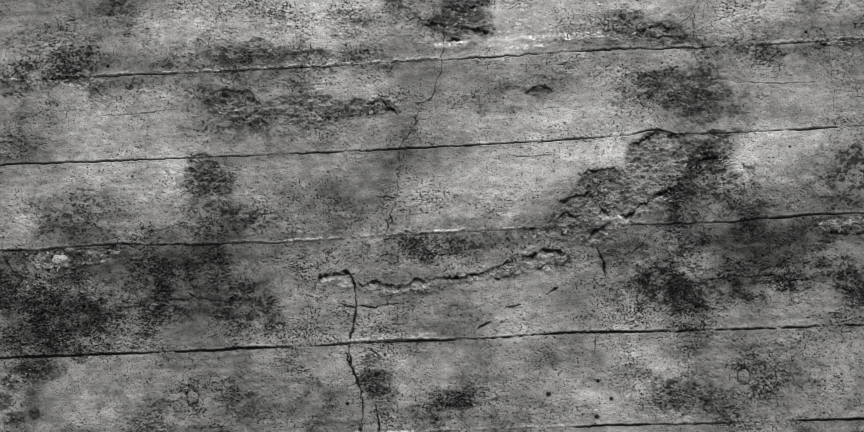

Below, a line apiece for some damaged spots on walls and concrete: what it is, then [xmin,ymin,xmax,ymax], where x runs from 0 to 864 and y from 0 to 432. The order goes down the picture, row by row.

spalling [424,0,494,43]
spalling [525,85,552,98]
peeling [641,69,729,125]
spalling [521,129,720,247]
crack [342,248,567,432]